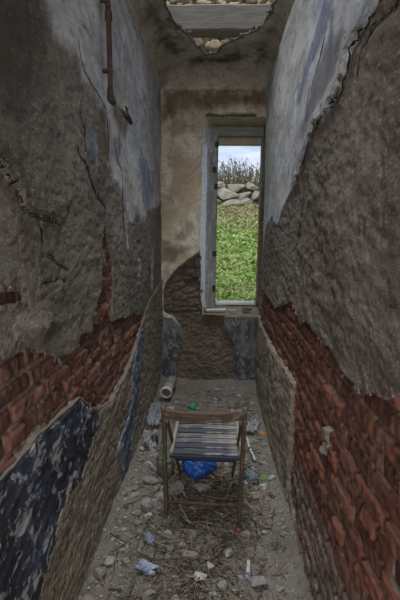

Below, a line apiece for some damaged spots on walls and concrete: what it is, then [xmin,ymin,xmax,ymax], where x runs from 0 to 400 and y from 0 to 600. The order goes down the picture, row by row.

crack [77,43,125,234]
flaking render [163,0,278,56]
flaking render [291,0,373,186]
crack [279,0,400,244]
crack [39,225,68,284]
flaking render [0,134,400,600]